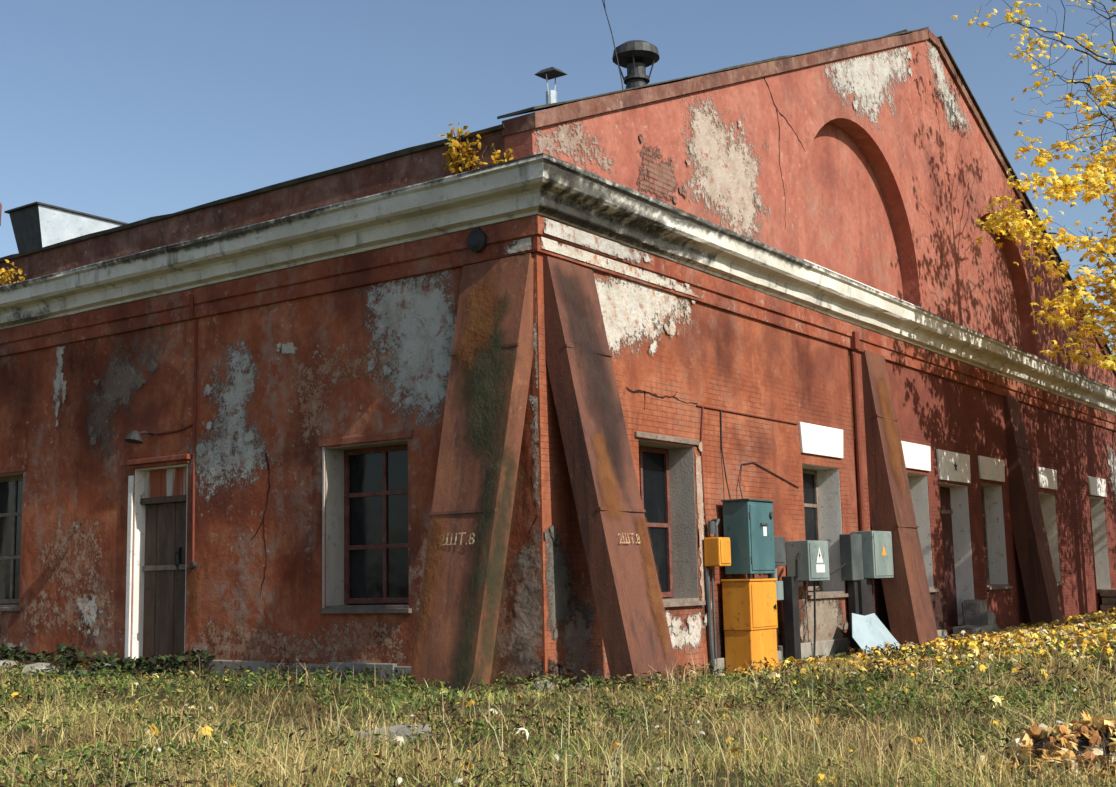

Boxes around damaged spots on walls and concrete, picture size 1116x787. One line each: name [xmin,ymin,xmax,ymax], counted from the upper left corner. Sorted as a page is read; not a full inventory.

flaking render [637,95,773,240]
crack [763,76,805,229]
flaking render [825,46,912,129]
flaking render [84,326,165,460]
flaking render [186,339,276,503]
flaking render [363,270,457,429]
flaking render [505,218,704,357]
crack [626,387,698,410]
crack [251,450,270,596]
flaking render [666,442,716,651]
damp [498,563,607,686]